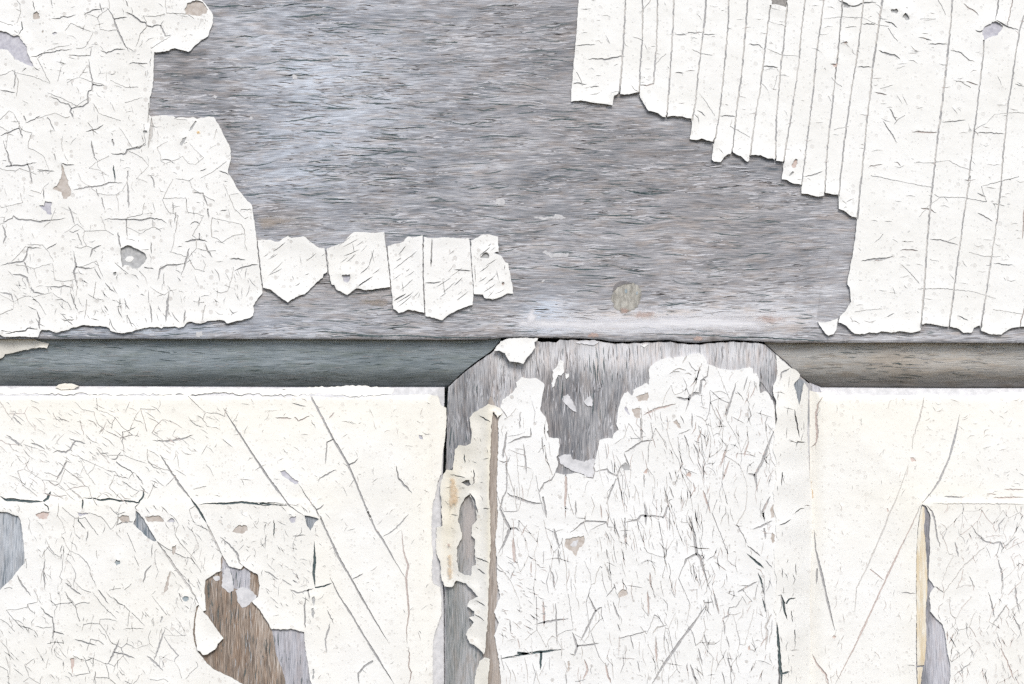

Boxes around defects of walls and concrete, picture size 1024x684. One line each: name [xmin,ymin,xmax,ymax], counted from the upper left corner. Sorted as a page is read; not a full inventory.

crack [0,0,257,334]
peeling [0,0,1024,479]
crack [574,0,1024,328]
peeling [0,512,25,590]
peeling [182,556,315,684]
peeling [431,412,501,684]
crack [0,334,1024,684]
peeling [565,536,585,556]
peeling [916,505,950,684]